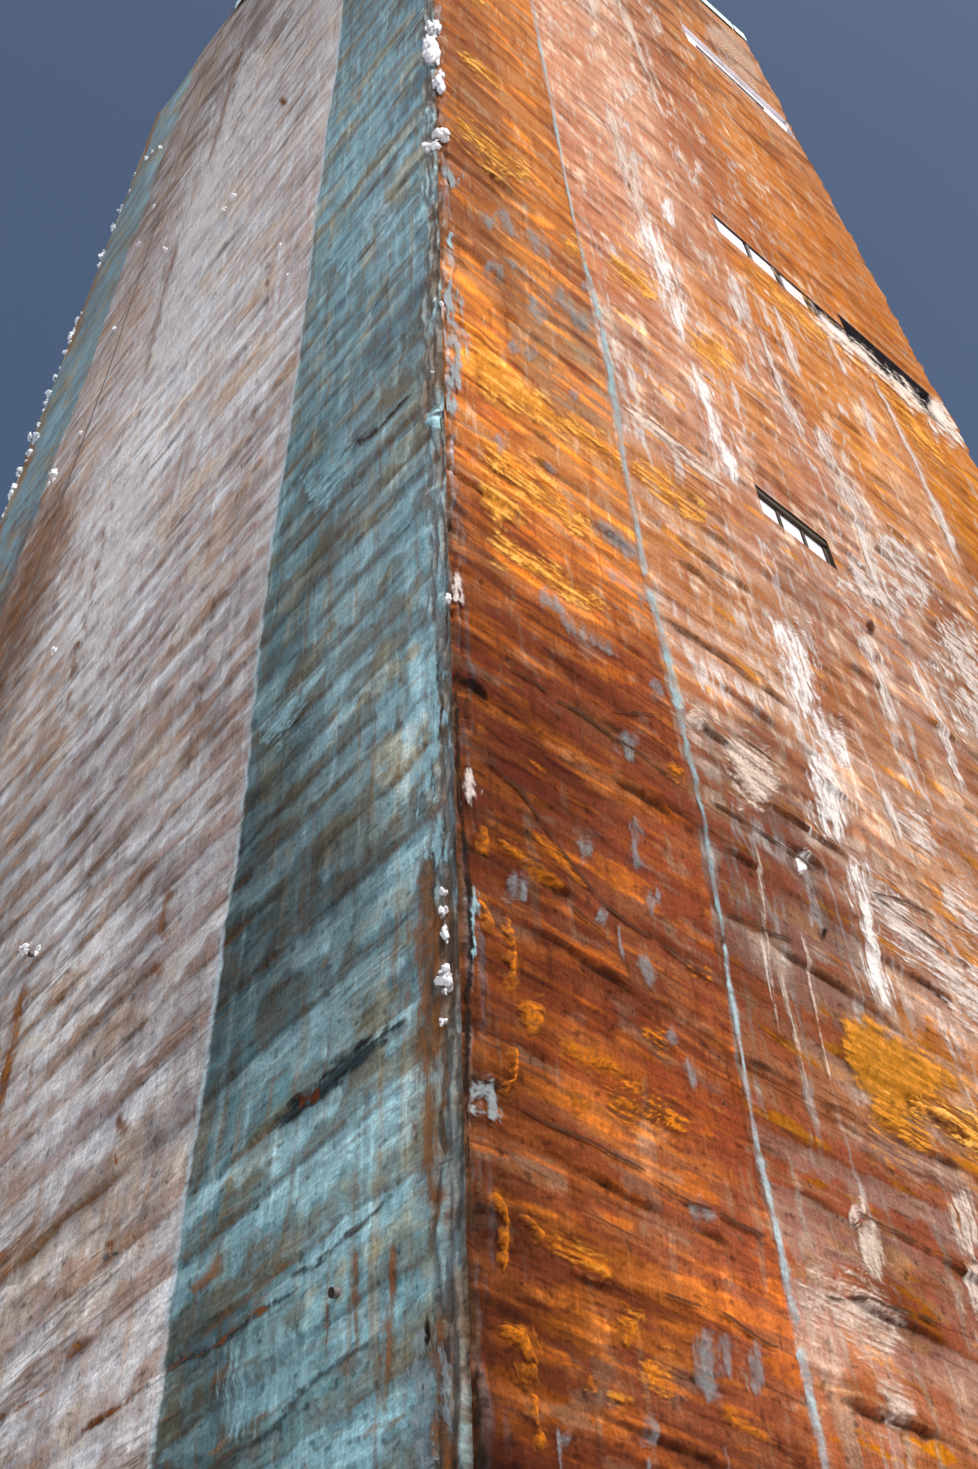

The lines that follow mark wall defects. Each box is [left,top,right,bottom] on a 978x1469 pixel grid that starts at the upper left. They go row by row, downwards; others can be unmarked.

corrosion [458,117,539,186]
leakage [605,109,687,339]
corrosion [468,335,707,521]
leakage [624,368,738,487]
corrosion [475,437,602,610]
leakage [759,308,978,789]
leakage [725,737,777,812]
leakage [769,618,851,841]
leakage [848,859,978,1033]
corrosion [0,983,28,1105]
corrosion [560,1027,690,1137]
corrosion [841,1014,978,1163]